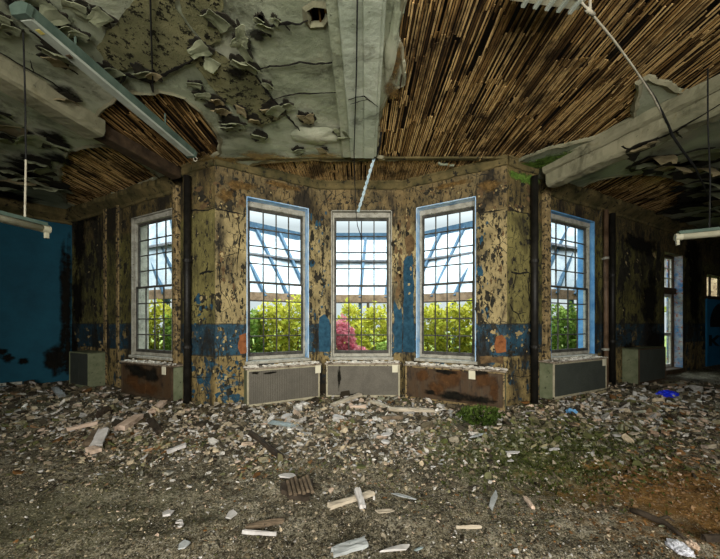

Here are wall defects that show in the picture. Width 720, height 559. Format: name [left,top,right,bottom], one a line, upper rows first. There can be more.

peeling [24,0,119,43]
flaking render [0,112,160,206]
peeling [187,36,221,74]
flaking render [95,60,317,167]
peeling [200,9,281,90]
crack [255,61,378,131]
flaking render [249,0,720,181]
flaking render [581,136,720,223]
leakage [44,216,98,376]
peeling [191,215,247,403]
peeling [391,201,415,352]
peeling [469,180,531,394]